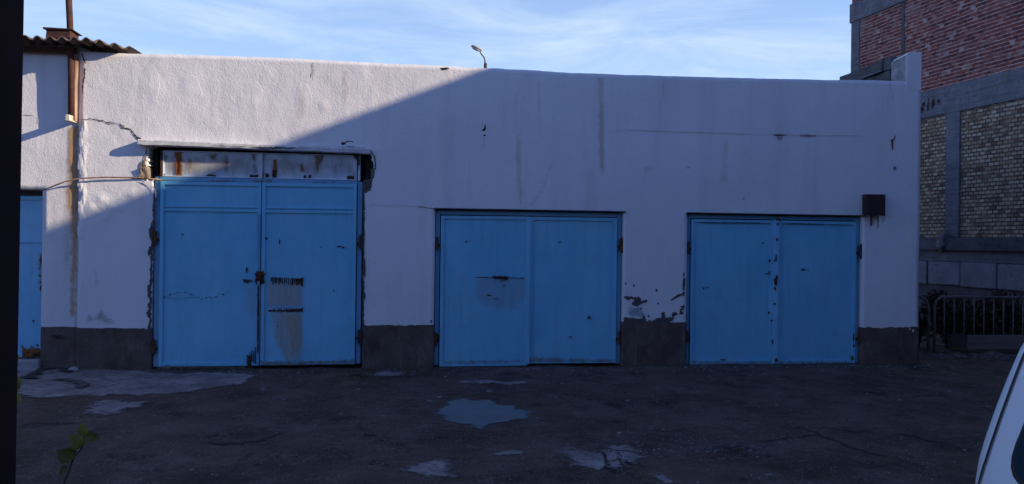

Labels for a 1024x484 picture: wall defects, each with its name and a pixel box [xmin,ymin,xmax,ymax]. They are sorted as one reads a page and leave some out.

crack [80,118,141,139]
rust [155,152,190,181]
rust [250,160,277,182]
flaking render [623,272,685,323]
rust [162,267,354,369]